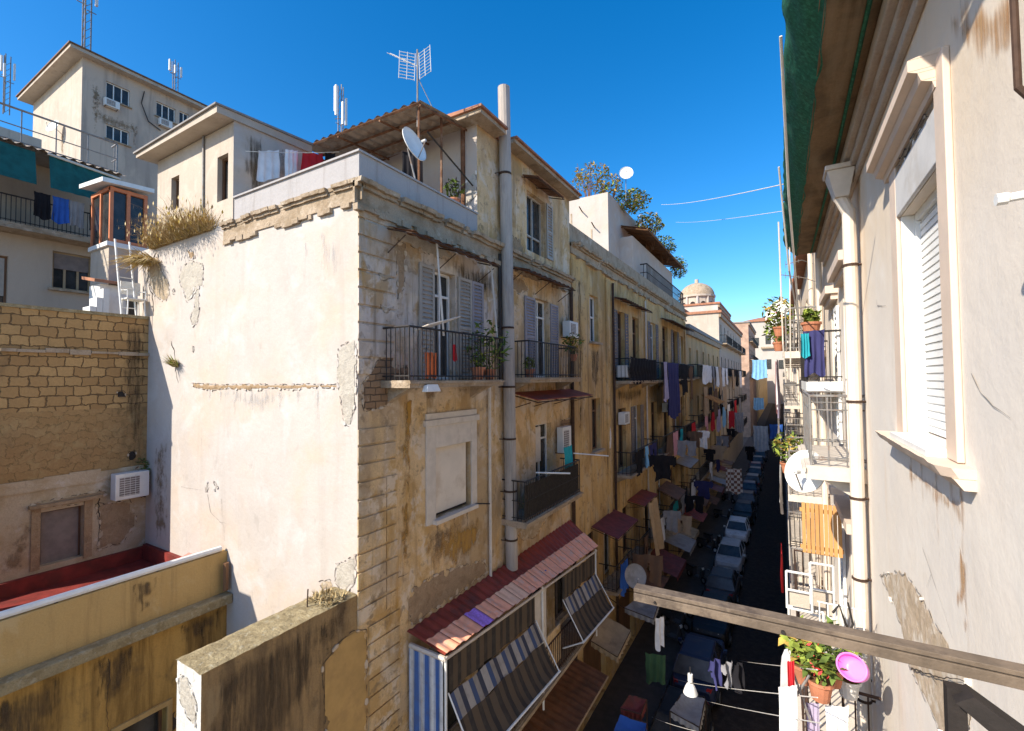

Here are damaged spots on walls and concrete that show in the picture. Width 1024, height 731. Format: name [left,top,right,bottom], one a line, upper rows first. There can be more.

flaking render [148,249,204,327]
flaking render [191,341,411,427]
flaking render [30,489,137,551]
flaking render [319,553,357,591]
flaking render [880,570,948,648]
flaking render [172,674,197,731]
flaking render [908,664,972,731]